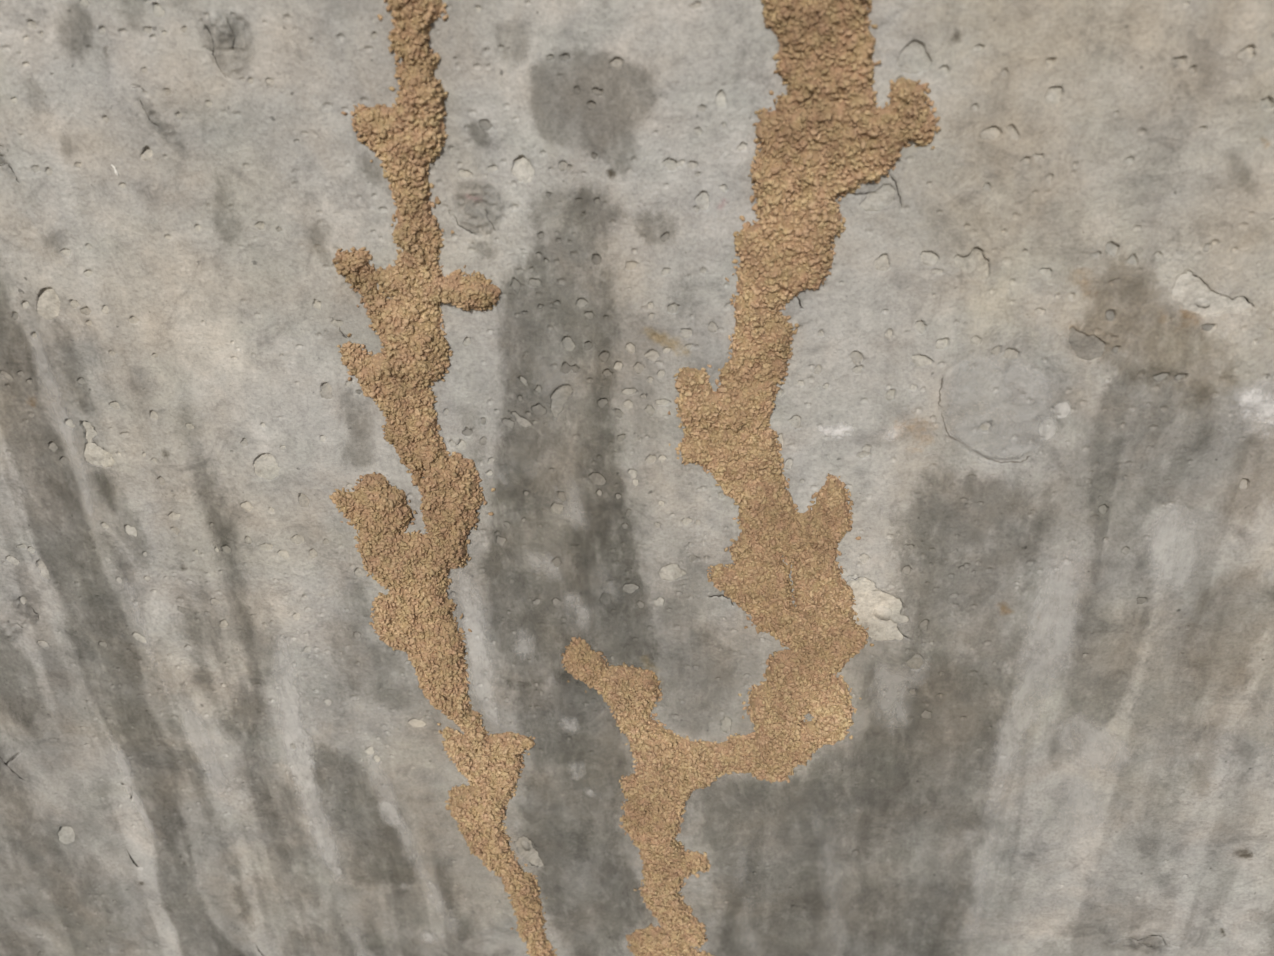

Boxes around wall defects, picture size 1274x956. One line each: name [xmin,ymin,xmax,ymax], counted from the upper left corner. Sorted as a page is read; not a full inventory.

leakage [1240,390,1274,419]
leakage [1152,509,1194,586]
leakage [276,643,342,876]
leakage [993,559,1075,794]